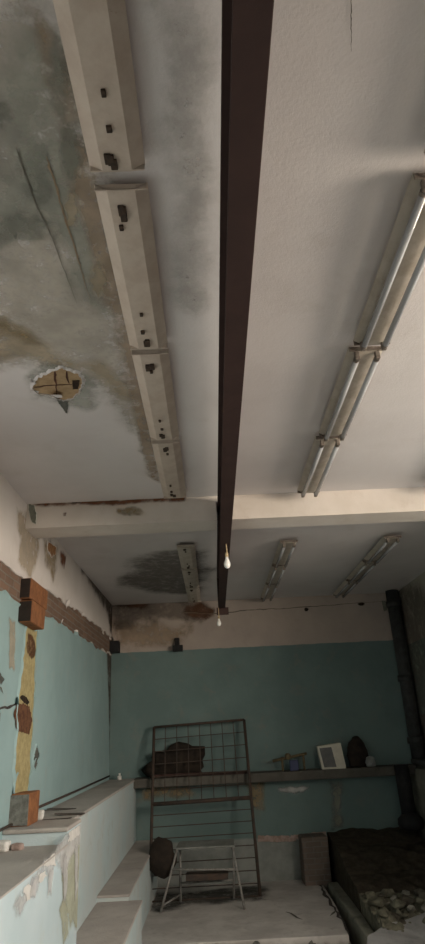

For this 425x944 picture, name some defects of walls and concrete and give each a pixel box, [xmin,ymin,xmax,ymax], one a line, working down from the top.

water stain [0,9,158,481]
spalling [29,365,86,413]
spalling [28,504,37,524]
spalling [0,559,23,607]
spalling [43,586,114,655]
water stain [81,553,214,645]